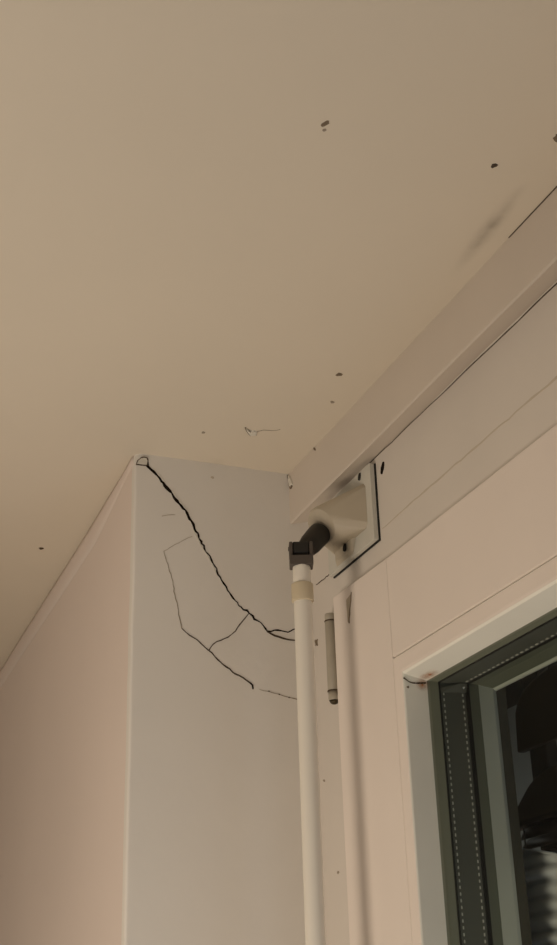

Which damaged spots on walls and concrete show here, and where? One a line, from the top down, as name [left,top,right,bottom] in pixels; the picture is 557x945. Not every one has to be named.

crack [146,461,297,700]